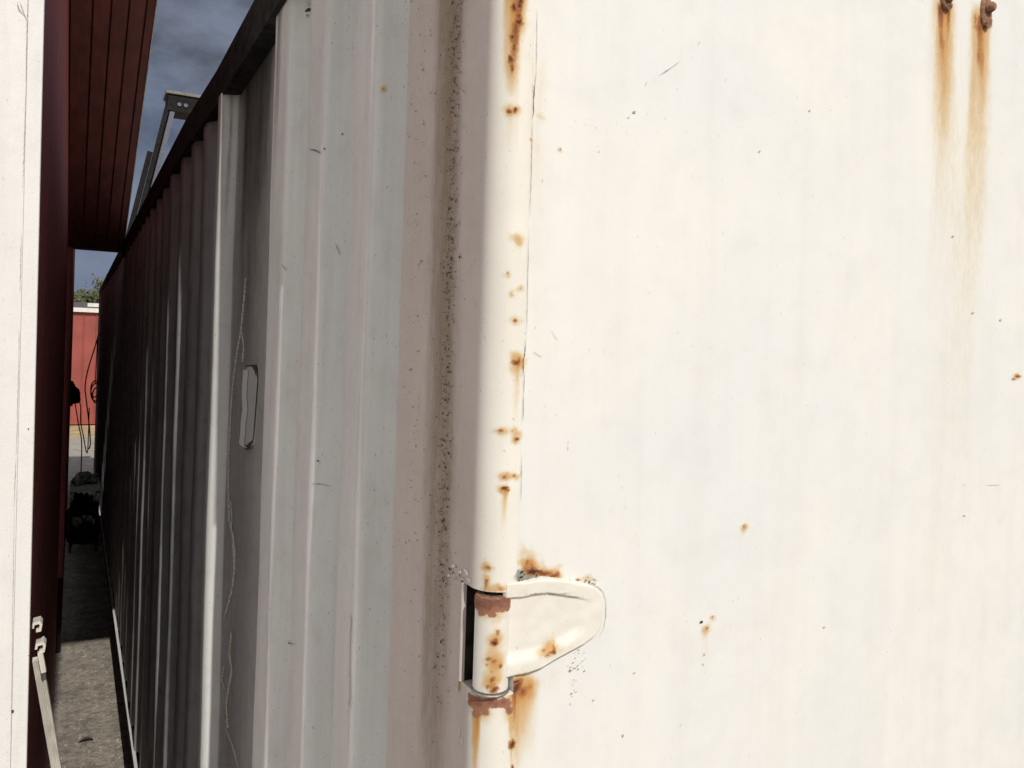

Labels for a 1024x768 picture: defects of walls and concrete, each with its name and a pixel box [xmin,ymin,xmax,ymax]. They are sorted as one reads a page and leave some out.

corrosion [505,0,526,82]
corrosion [937,0,953,116]
corrosion [973,10,989,105]
corrosion [512,353,523,375]
corrosion [499,473,517,500]
corrosion [474,563,511,617]
corrosion [520,558,561,578]
corrosion [541,640,557,656]
corrosion [458,630,535,768]